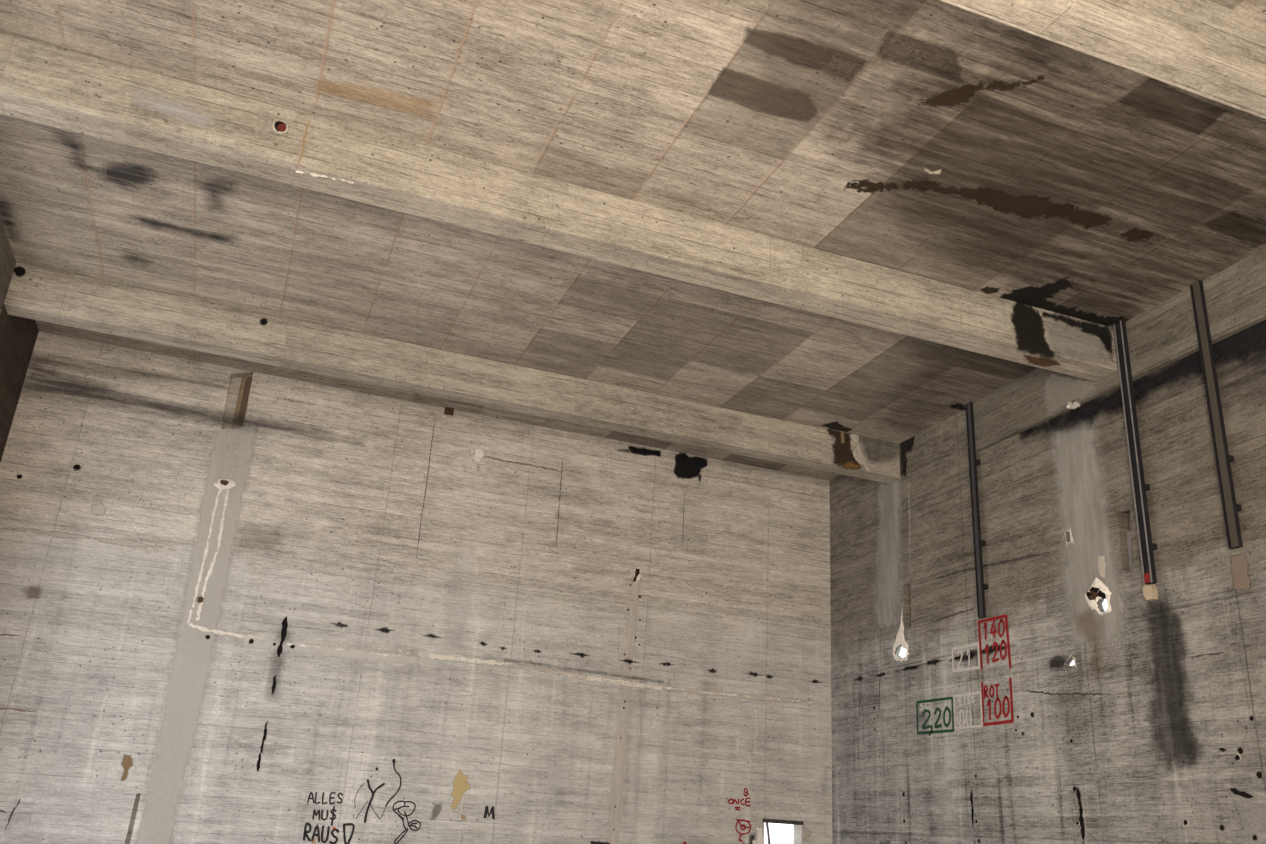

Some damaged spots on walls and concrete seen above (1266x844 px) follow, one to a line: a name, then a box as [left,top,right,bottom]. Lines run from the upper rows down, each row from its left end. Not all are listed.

damp [1149,601,1199,765]